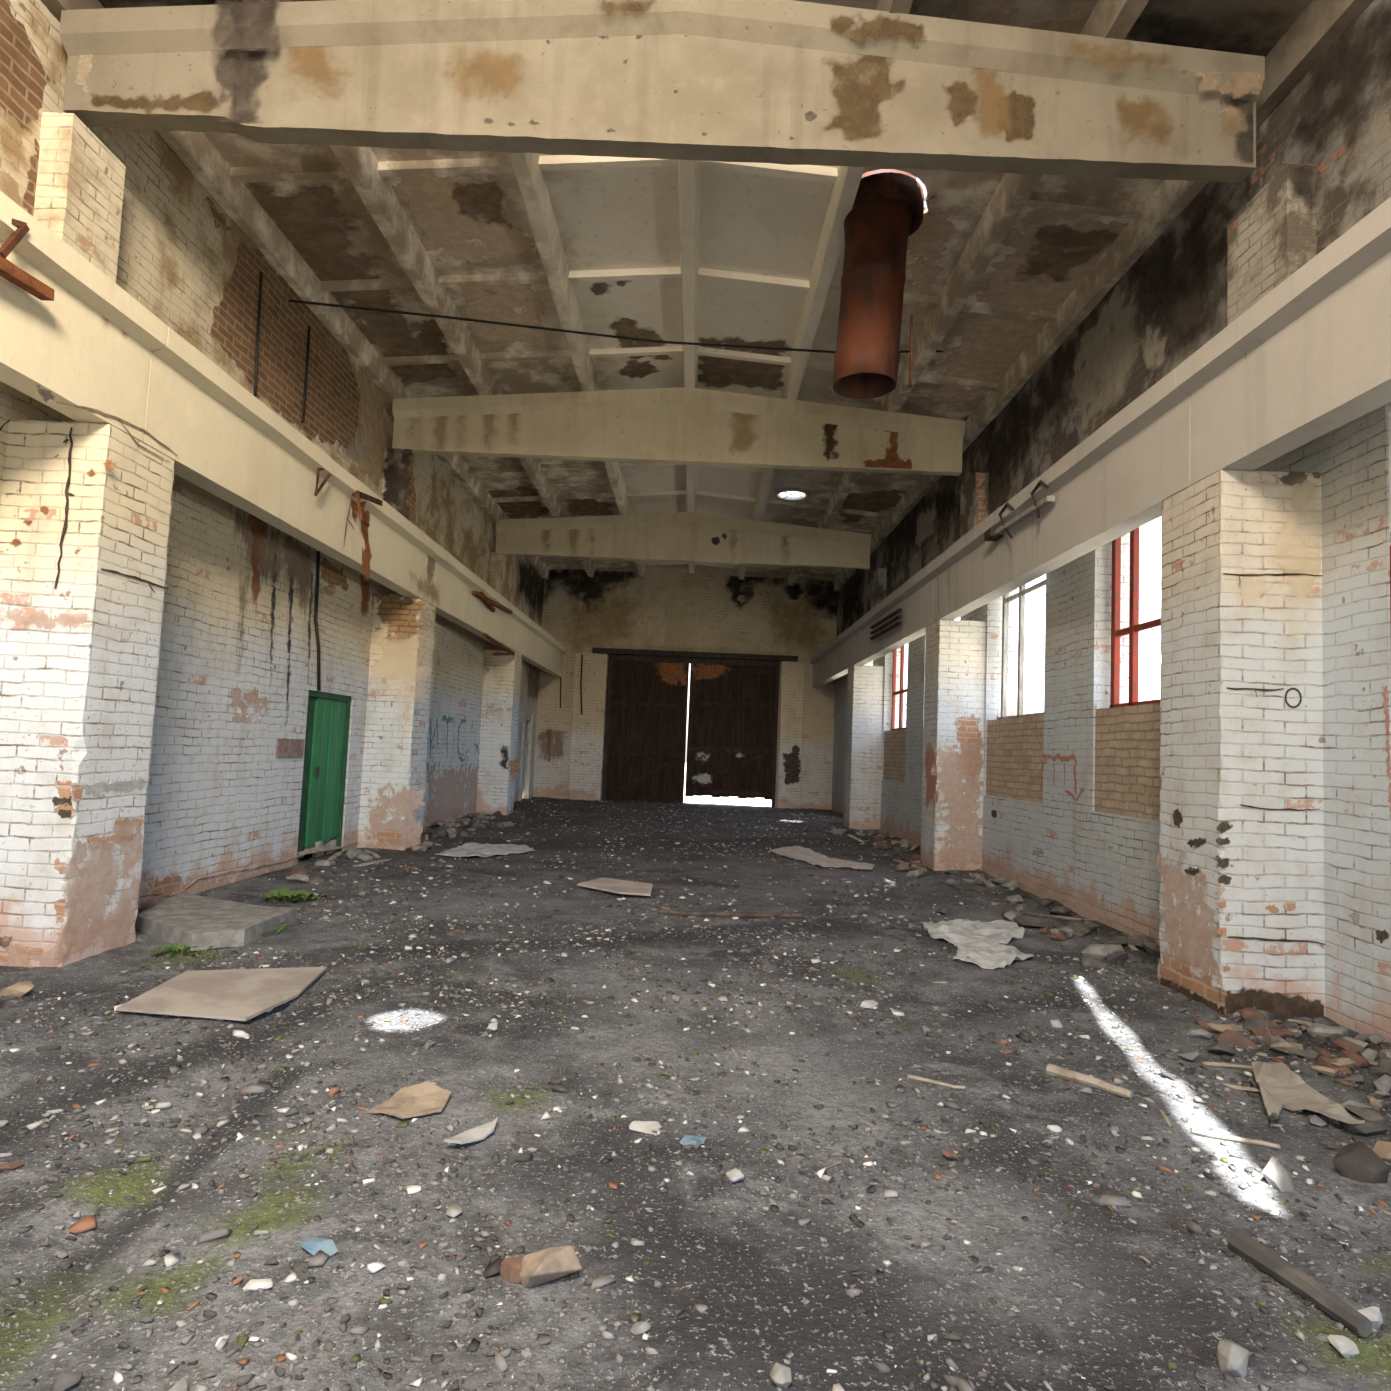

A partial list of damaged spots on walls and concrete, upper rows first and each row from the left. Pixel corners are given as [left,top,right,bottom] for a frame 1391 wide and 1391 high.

peeling [0,0,50,216]
damp [825,15,925,140]
damp [946,67,1035,142]
damp [1118,100,1171,140]
flaking render [205,197,394,487]
crack [54,401,178,592]
spalling [1280,471,1320,486]
corrosion [351,500,428,644]
damp [517,562,544,617]
spalling [52,778,147,819]
peeling [0,815,307,967]
flaking render [1156,809,1389,1108]